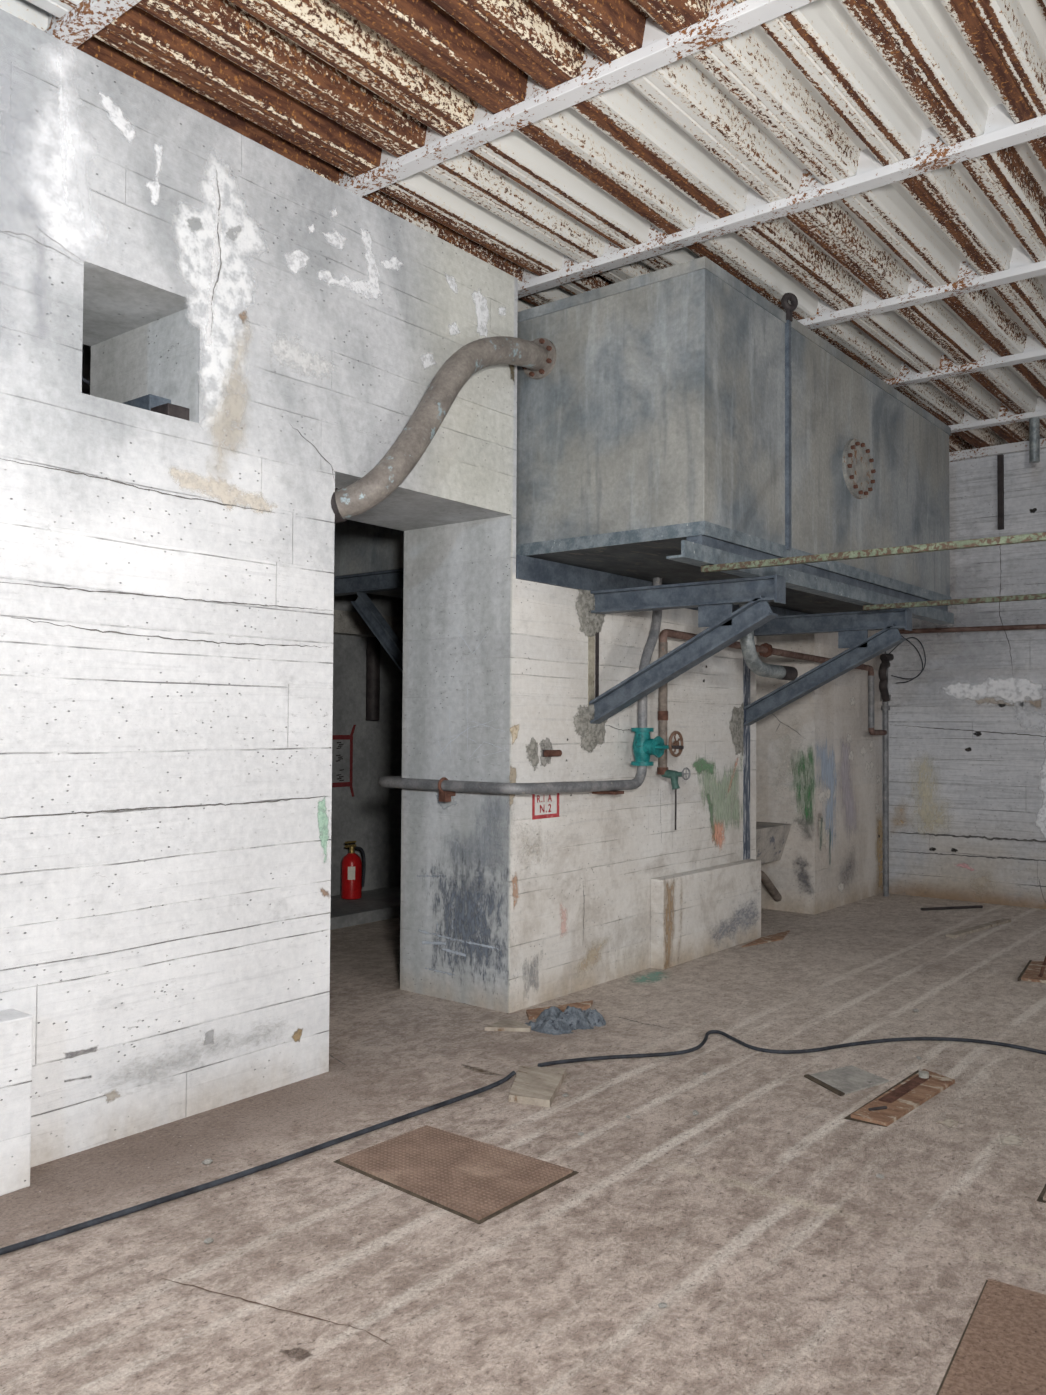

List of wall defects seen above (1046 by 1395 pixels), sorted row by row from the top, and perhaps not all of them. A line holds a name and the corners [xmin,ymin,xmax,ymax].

damp [175,154,266,427]
crack [162,1278,390,1345]